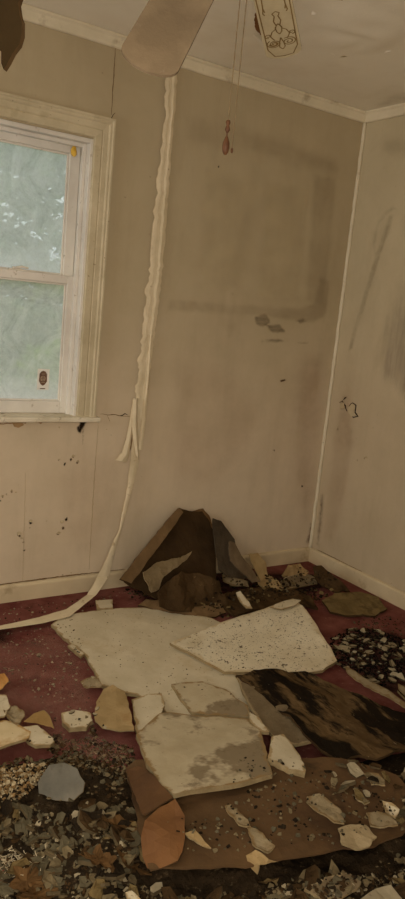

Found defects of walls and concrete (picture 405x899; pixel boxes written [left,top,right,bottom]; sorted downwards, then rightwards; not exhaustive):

peeling [253,13,264,47]